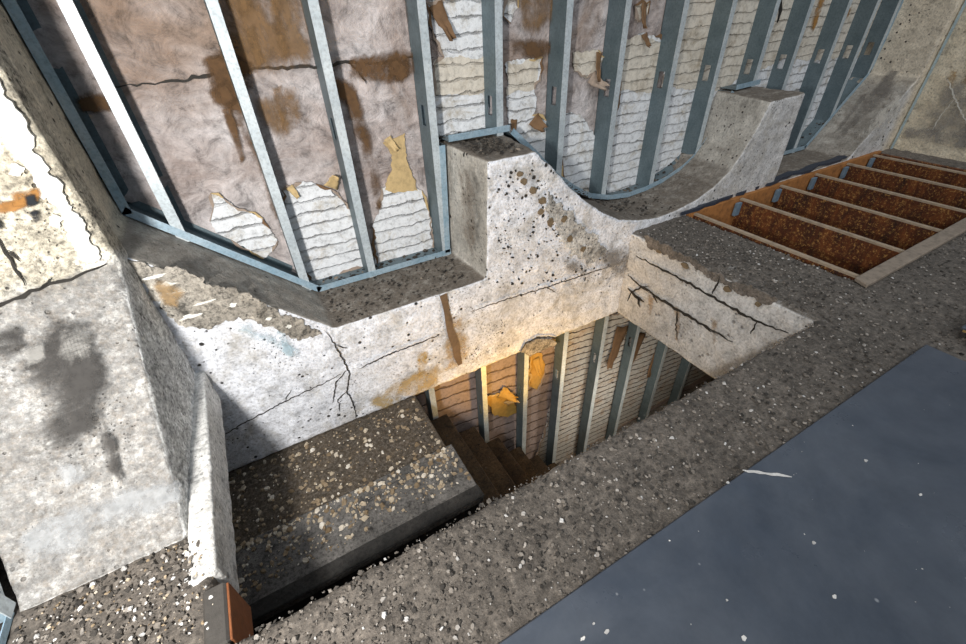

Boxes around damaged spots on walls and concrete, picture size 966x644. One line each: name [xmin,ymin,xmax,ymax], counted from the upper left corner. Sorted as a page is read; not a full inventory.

leakage [203,49,262,173]
leakage [226,0,310,88]
leakage [333,51,415,153]
peeling [426,0,489,141]
peeling [572,0,882,193]
rust [0,189,41,213]
crack [0,241,107,307]
peeling [208,193,278,259]
peeling [282,175,434,281]
crack [471,256,788,342]
leakage [0,324,122,480]
crack [225,332,439,434]